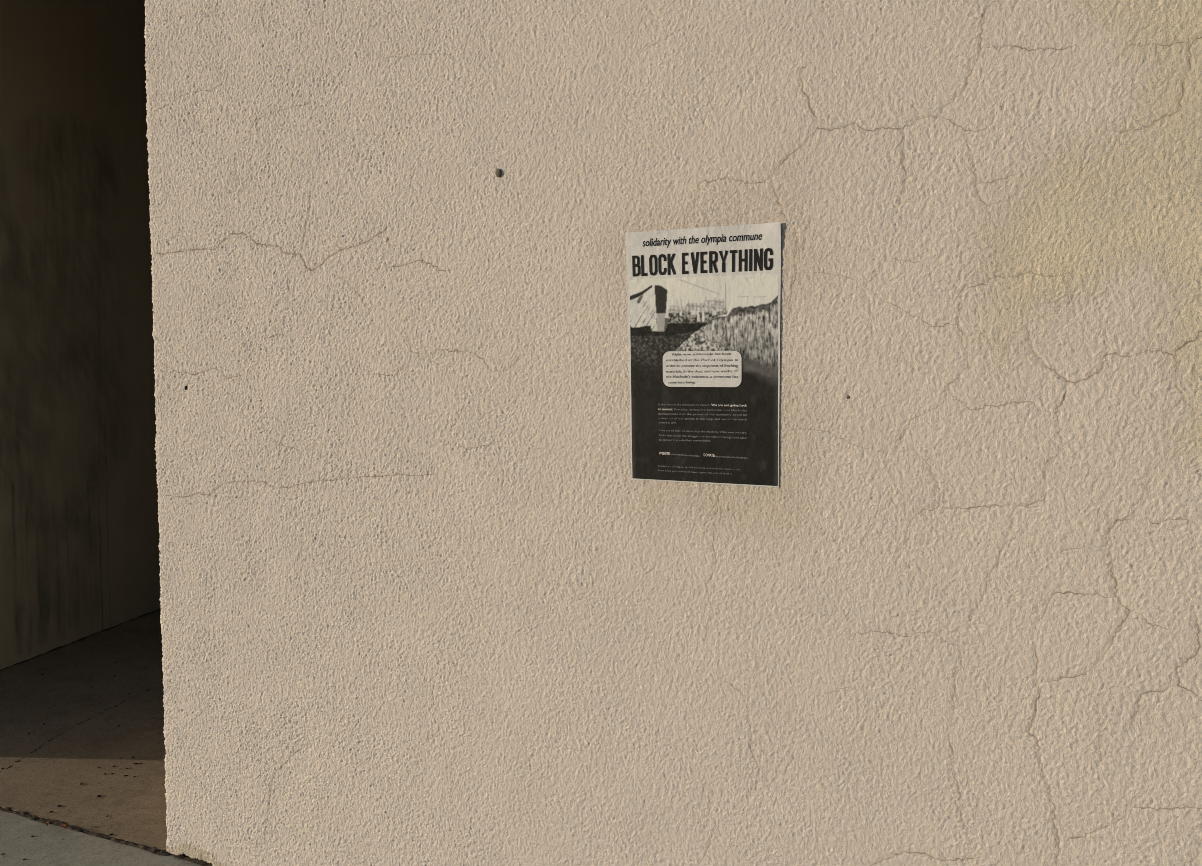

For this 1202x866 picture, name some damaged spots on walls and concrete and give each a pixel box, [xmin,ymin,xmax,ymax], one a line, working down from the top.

crack [1055,366,1102,412]
crack [1111,571,1156,637]
crack [1028,653,1040,759]
crack [1137,620,1200,710]